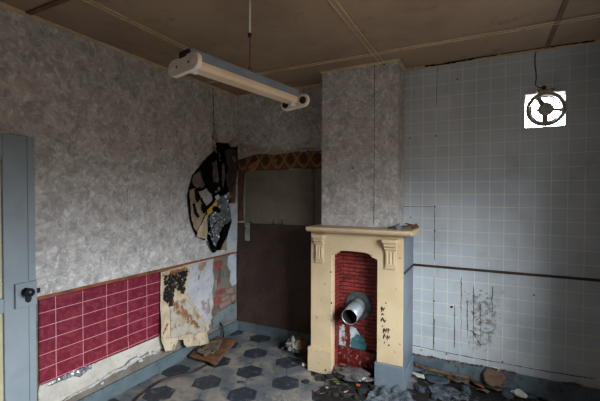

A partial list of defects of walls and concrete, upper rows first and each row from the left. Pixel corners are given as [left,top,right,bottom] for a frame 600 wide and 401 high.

flaking render [205,253,237,329]
water stain [460,278,494,346]
spalling [37,333,164,401]